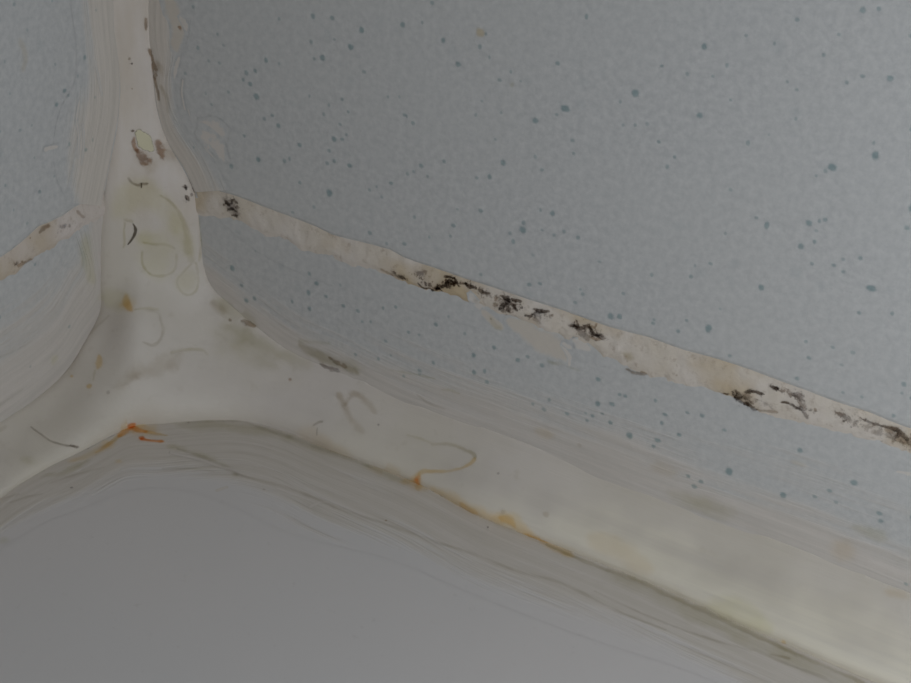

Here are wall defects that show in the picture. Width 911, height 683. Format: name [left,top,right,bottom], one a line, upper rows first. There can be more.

water stain [419,276,480,289]